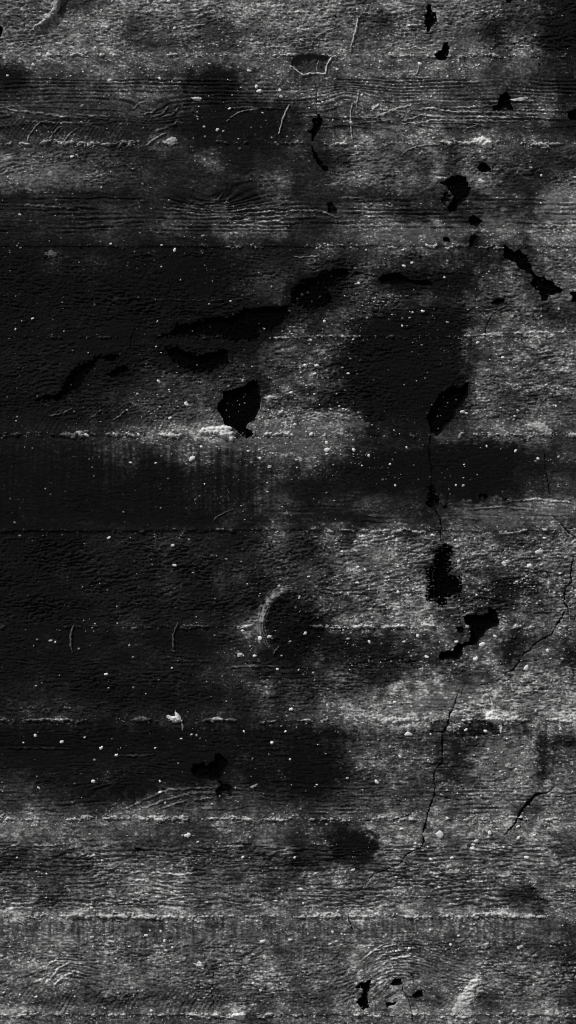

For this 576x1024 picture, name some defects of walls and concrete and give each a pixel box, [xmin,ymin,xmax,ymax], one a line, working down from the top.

spalling [291,53,330,74]
spalling [440,175,471,213]
spalling [503,245,576,302]
leakage [0,250,352,381]
leakage [184,222,575,531]
spalling [217,380,261,439]
spalling [426,382,468,436]
spalling [425,543,463,608]
spalling [439,607,500,660]
crack [365,515,575,885]
leakage [0,712,358,793]
spalling [356,980,376,1010]